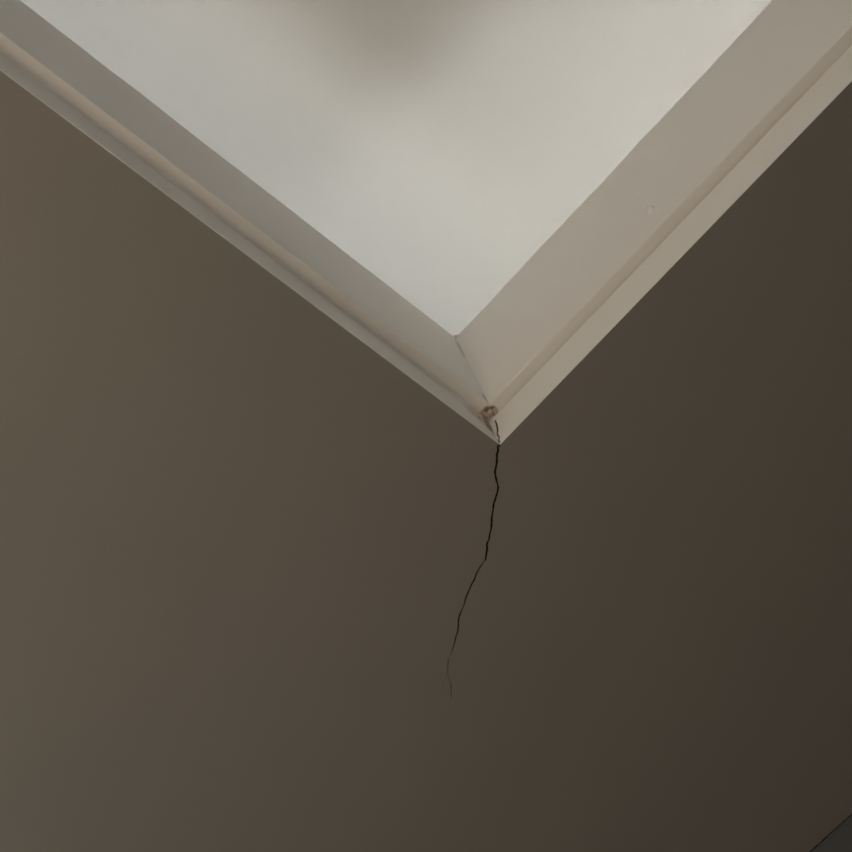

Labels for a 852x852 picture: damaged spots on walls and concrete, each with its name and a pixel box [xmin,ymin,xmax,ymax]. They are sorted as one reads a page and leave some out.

crack [448,395,500,661]